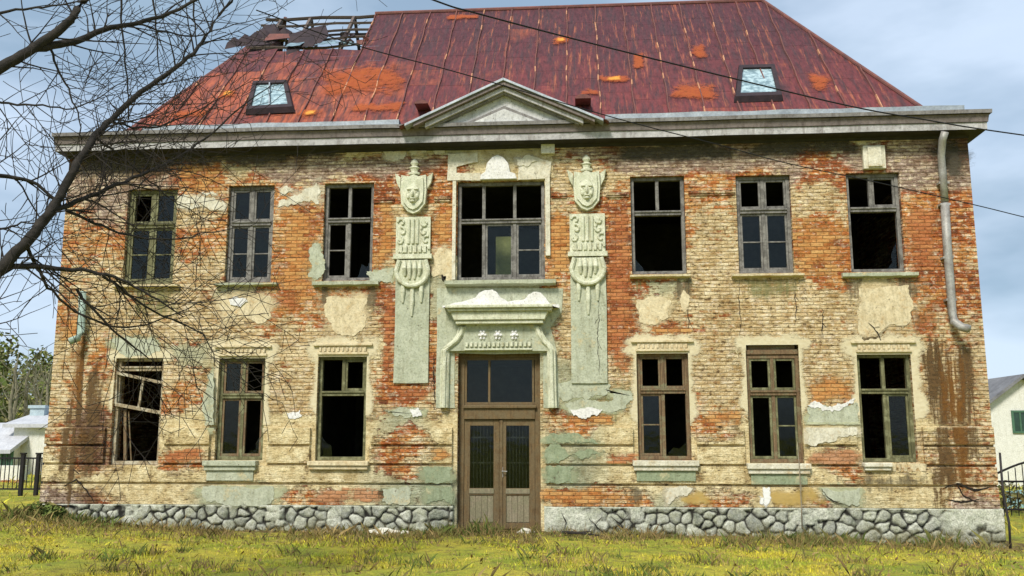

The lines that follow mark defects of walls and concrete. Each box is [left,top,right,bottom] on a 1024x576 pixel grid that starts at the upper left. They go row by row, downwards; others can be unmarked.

rust [320,64,406,111]
rust [581,53,643,94]
rust [671,83,718,99]
rust [809,73,831,91]
flaking render [513,155,538,167]
flaking render [803,376,862,469]
leakage [866,336,980,506]
flaking render [540,380,638,507]
crack [943,483,991,503]